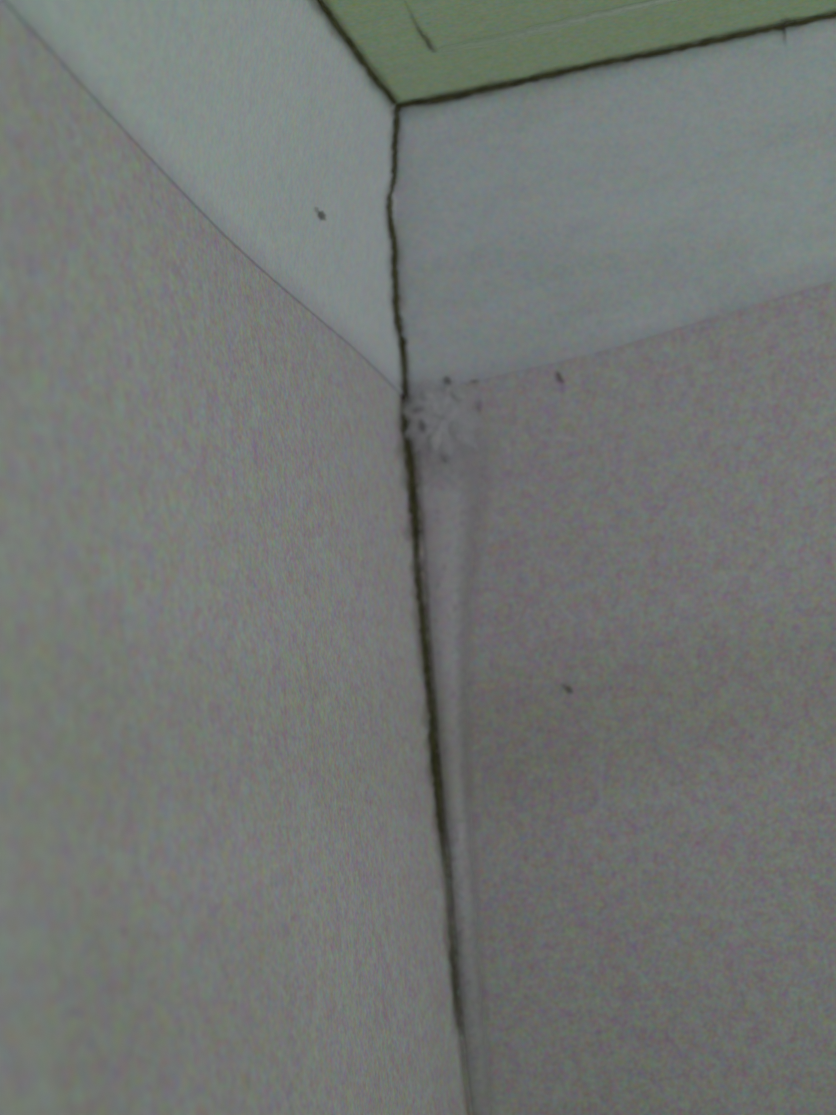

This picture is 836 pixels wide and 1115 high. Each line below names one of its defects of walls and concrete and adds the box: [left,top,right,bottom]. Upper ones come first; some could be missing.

crack [318,0,836,856]
crack [451,946,459,1010]